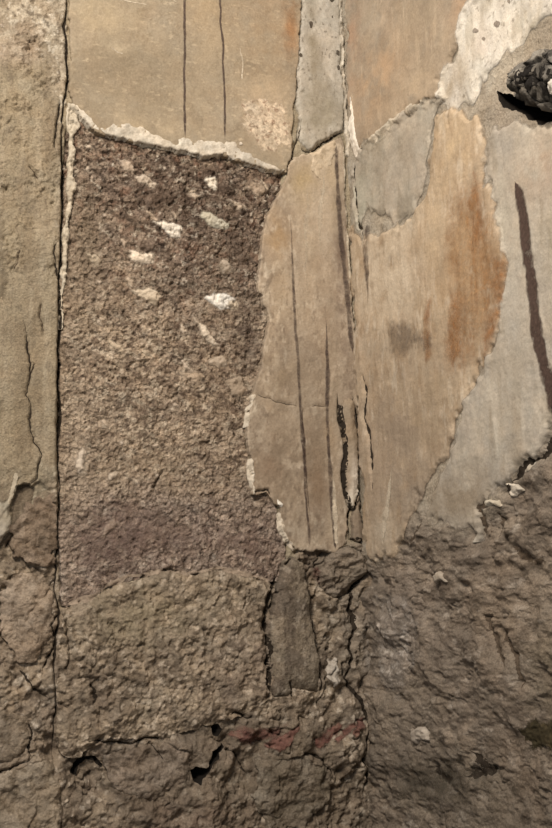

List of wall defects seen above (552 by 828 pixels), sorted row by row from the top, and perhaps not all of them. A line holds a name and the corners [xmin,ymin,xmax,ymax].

crack [0,0,70,772]
spalling [0,473,35,545]
crack [337,378,373,543]
crack [88,737,163,759]
crack [261,559,292,697]
crack [304,752,334,780]
crack [341,574,369,801]